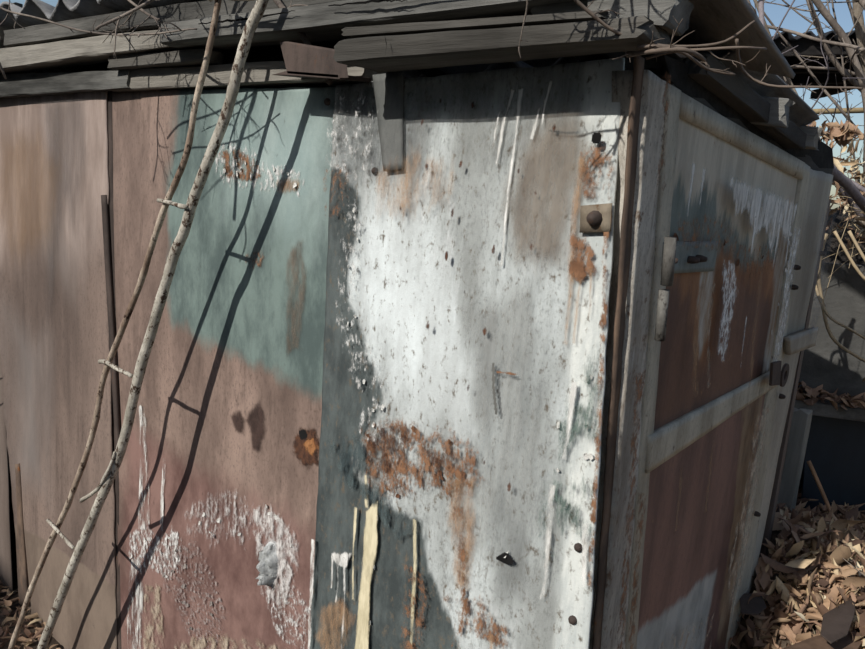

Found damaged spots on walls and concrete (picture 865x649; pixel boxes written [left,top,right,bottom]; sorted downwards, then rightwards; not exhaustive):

crack [328,0,405,8]
corrosion [566,142,612,387]
peeling [127,468,314,649]
corrosion [303,438,319,456]
peeling [331,552,351,603]
peeling [328,399,408,541]
corrosion [361,420,507,649]
corrosion [589,400,602,562]